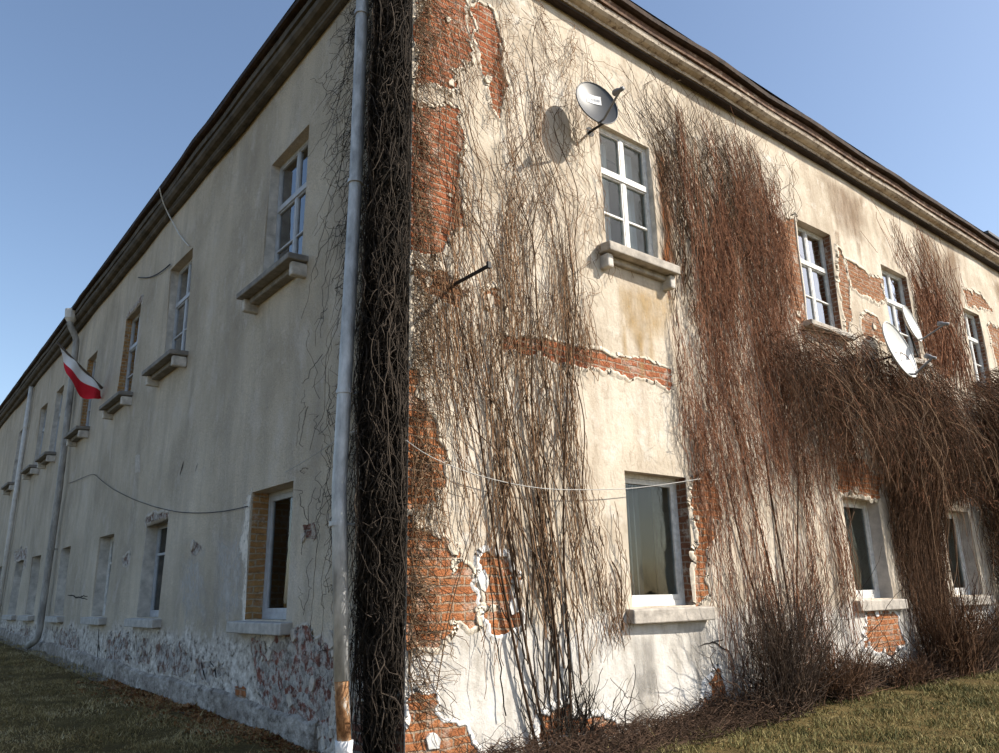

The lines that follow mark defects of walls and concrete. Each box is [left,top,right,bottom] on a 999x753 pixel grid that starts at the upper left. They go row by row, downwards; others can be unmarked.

flaking render [410,0,512,313]
flaking render [498,329,674,394]
flaking render [834,244,887,348]
flaking render [907,272,958,381]
flaking render [961,286,999,376]
flaking render [351,359,525,753]
flaking render [860,599,908,659]
flaking render [103,622,335,753]